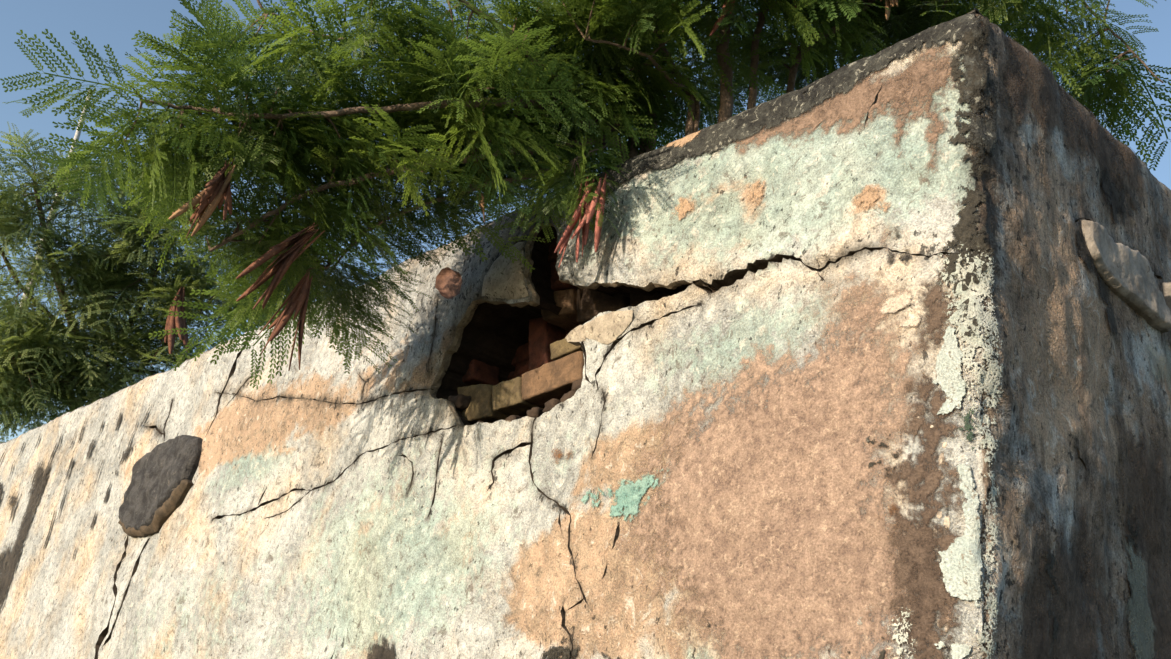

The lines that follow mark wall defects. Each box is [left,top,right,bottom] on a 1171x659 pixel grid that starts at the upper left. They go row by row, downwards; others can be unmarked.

crack [205,300,438,437]
spalling [435,267,462,299]
flaking render [457,235,671,423]
crack [581,247,949,459]
water stain [0,408,150,610]
crack [94,535,150,659]
crack [213,425,456,519]
water stain [367,637,395,659]
crack [486,418,620,659]
water stain [541,636,579,659]
water stain [1015,508,1111,659]
water stain [1121,421,1171,659]